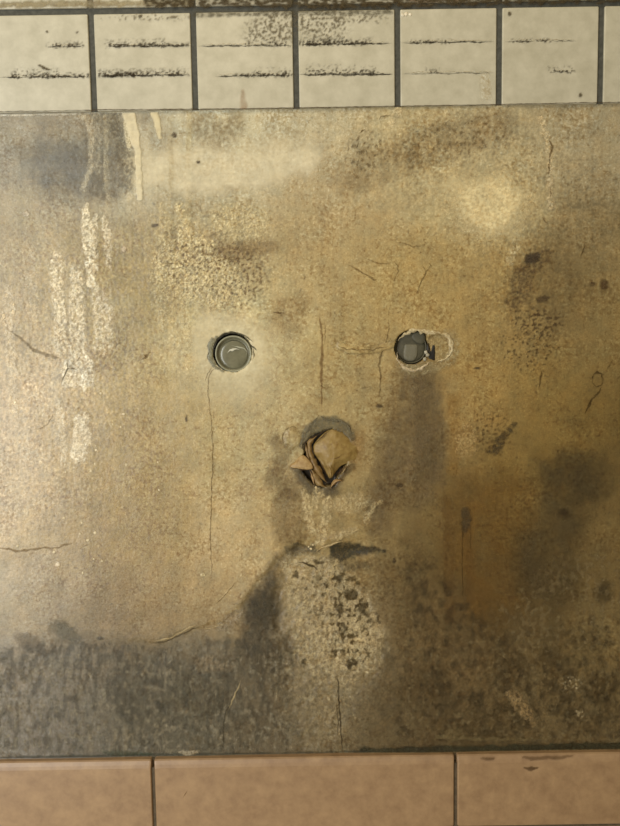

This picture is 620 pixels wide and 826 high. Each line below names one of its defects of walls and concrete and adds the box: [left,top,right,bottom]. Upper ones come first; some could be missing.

water stain [504,249,559,367]
spalling [396,328,459,372]
spalling [300,417,363,463]
water stain [368,366,442,528]
crack [5,543,72,552]
water stain [245,552,291,651]
crack [336,678,344,749]
water stain [0,749,235,759]
water stain [344,742,620,752]